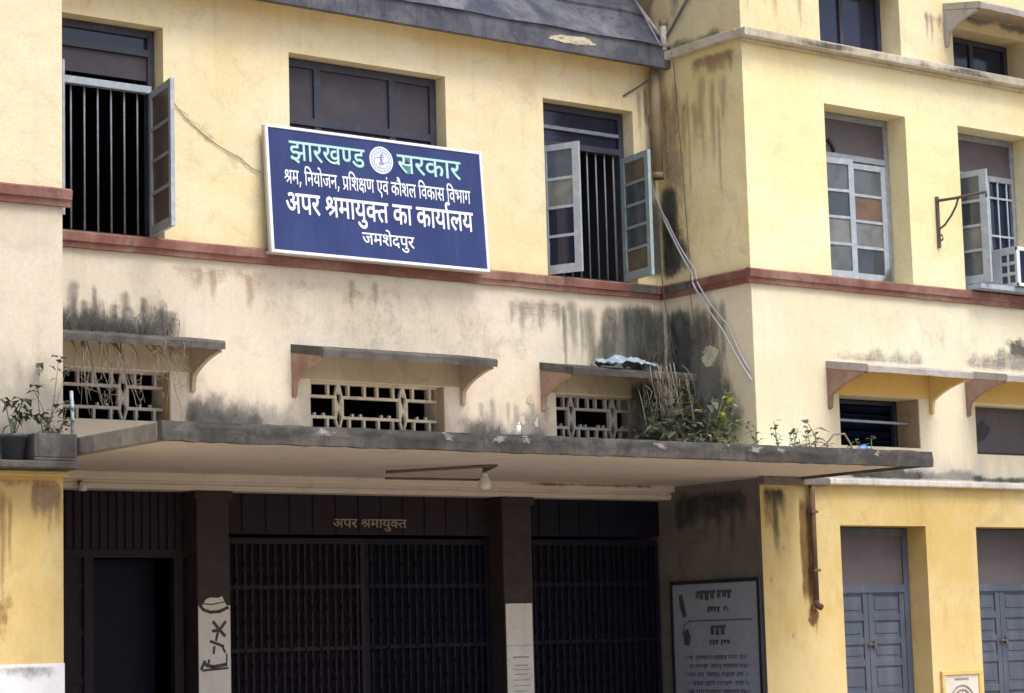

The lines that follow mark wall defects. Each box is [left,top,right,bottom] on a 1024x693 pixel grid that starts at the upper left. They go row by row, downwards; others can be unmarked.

peeling [549,35,596,45]
leakage [694,51,731,68]
leakage [652,101,687,277]
spalling [701,345,719,367]
leakage [971,340,1024,370]
leakage [597,308,817,454]
leakage [352,419,585,446]
leakage [678,491,743,527]
leakage [765,490,783,501]
corrosion [799,500,819,626]